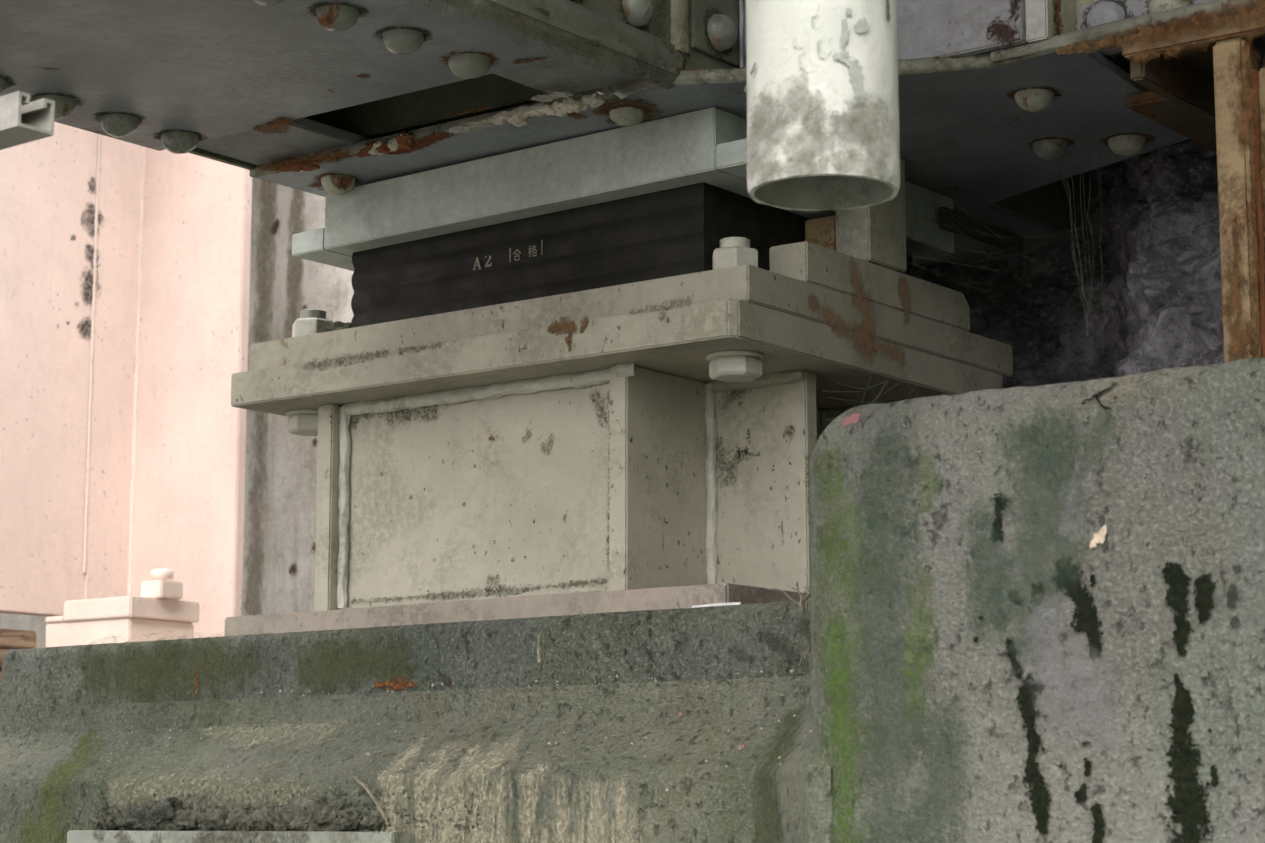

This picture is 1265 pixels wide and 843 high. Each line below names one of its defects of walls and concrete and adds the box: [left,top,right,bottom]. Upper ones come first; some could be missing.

corrosion [253,118,297,134]
corrosion [257,132,459,190]
peeling [597,88,648,99]
peeling [793,8,870,106]
corrosion [986,0,1021,48]
corrosion [1053,0,1265,362]
leakage [254,180,303,342]
corrosion [548,316,589,352]
leakage [245,411,266,616]
leakage [966,415,1108,843]
leakage [1161,562,1242,657]
leakage [1162,673,1219,843]